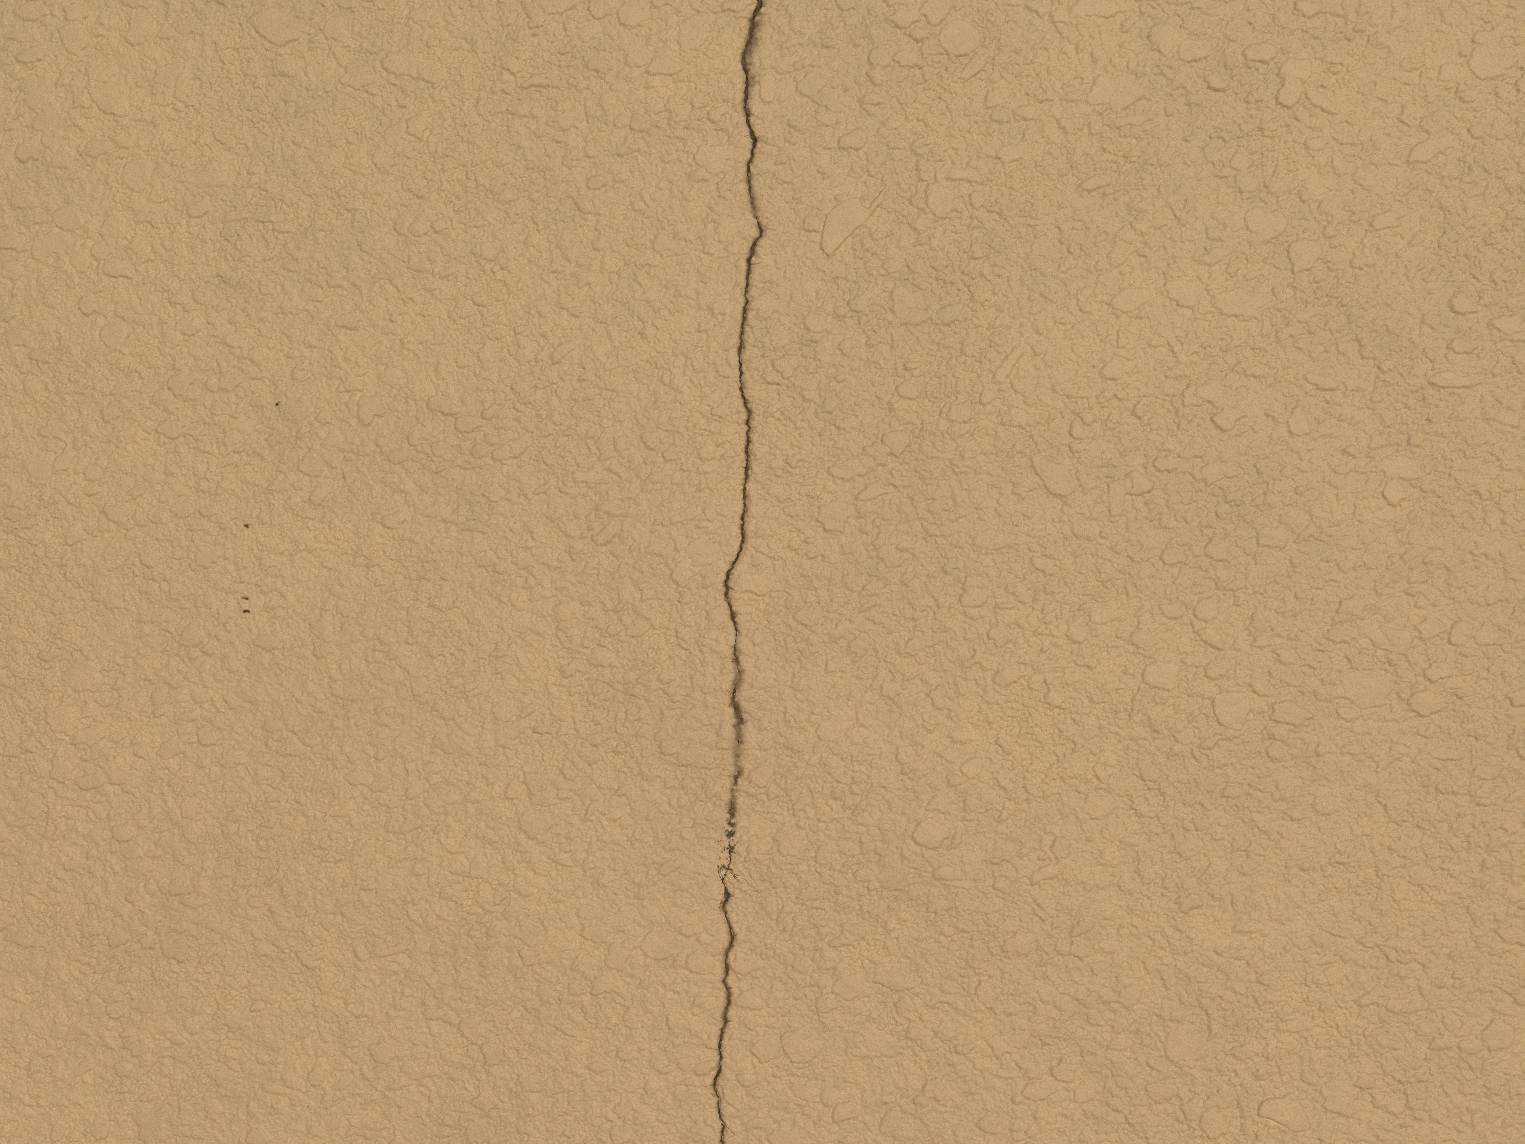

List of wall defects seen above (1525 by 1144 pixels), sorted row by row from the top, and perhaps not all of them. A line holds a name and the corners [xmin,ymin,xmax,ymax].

crack [710,0,765,1144]